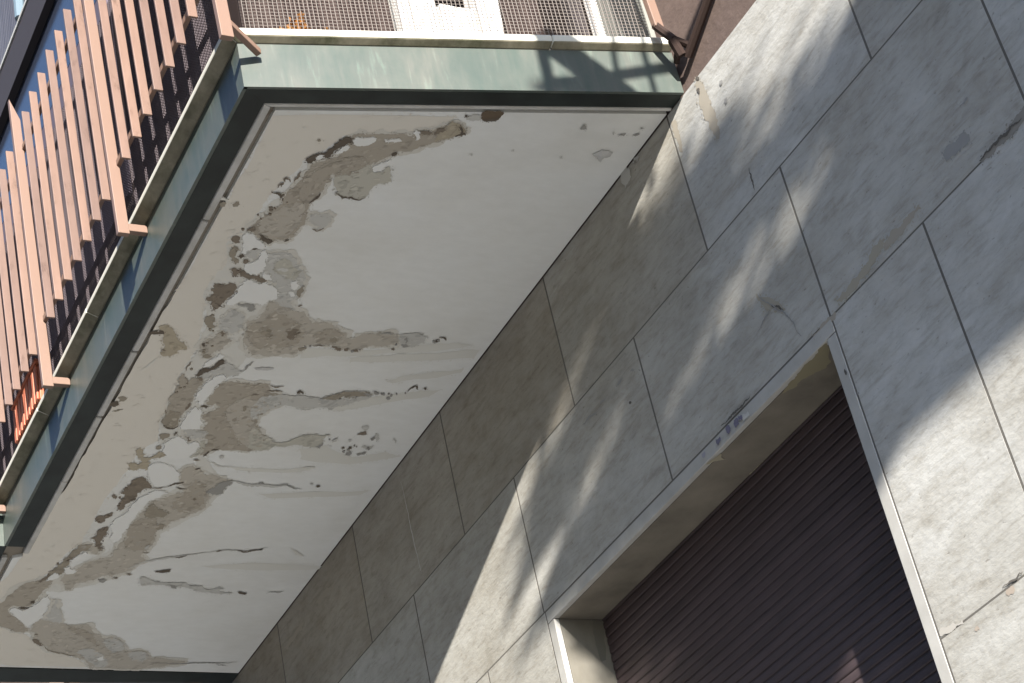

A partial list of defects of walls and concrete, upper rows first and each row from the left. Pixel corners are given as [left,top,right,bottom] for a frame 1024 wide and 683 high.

crack [979,119,1021,161]
crack [757,294,801,336]
peeling [0,115,467,670]